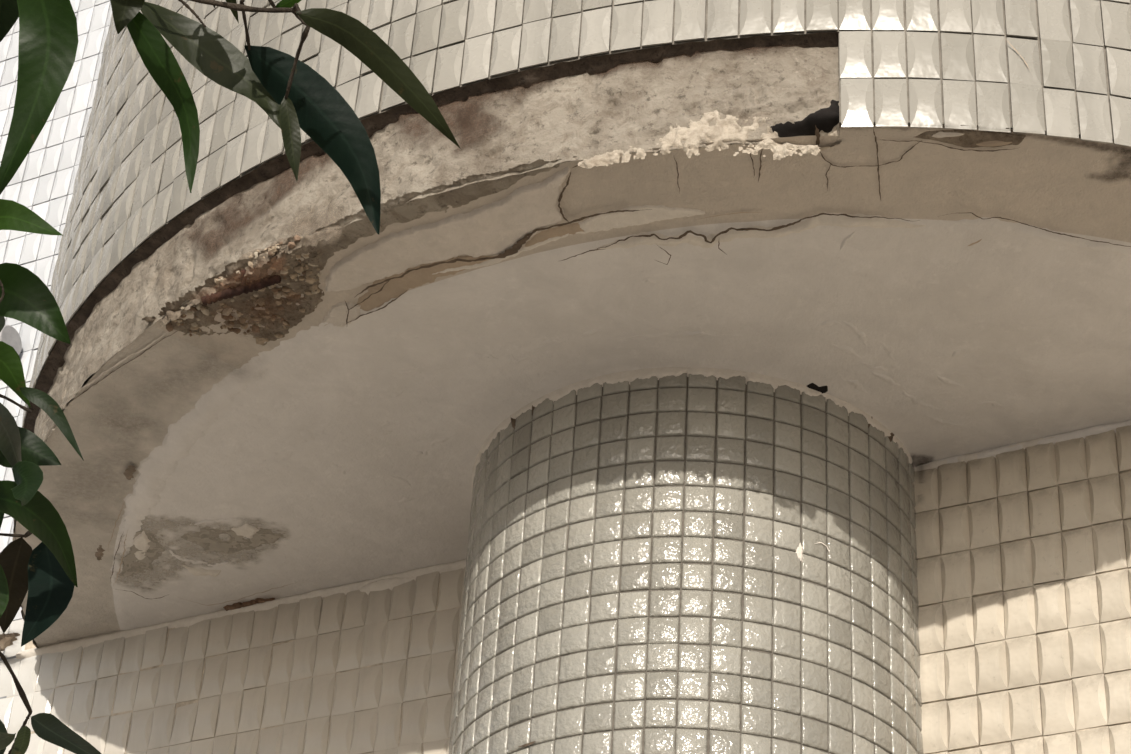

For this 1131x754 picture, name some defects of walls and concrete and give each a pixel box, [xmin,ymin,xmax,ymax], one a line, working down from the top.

crack [815,125,922,200]
flaking render [911,125,1026,152]
spalling [24,32,926,443]
crack [345,165,652,324]
crack [943,212,1131,256]
peeling [115,518,286,599]